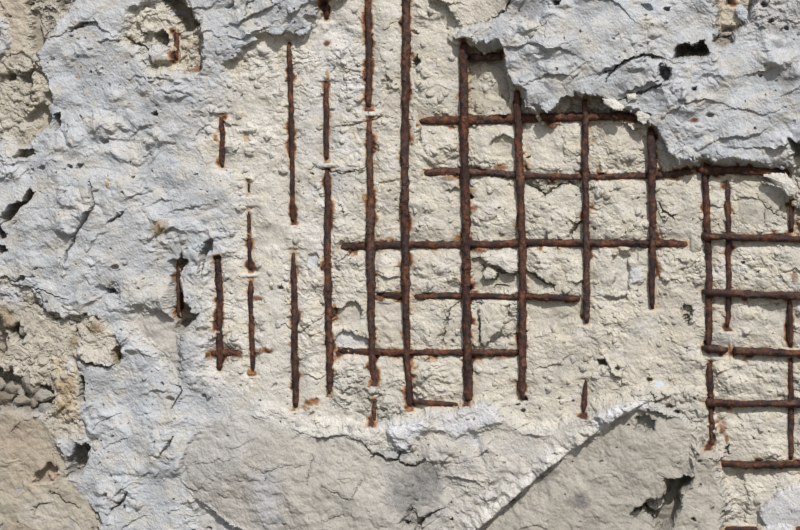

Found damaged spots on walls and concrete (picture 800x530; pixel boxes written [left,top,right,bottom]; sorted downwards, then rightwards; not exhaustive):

spalling [0,0,74,145]
spalling [119,0,204,74]
crack [63,181,125,265]
spalling [196,0,800,530]
spalling [0,278,121,530]
crack [400,507,446,530]